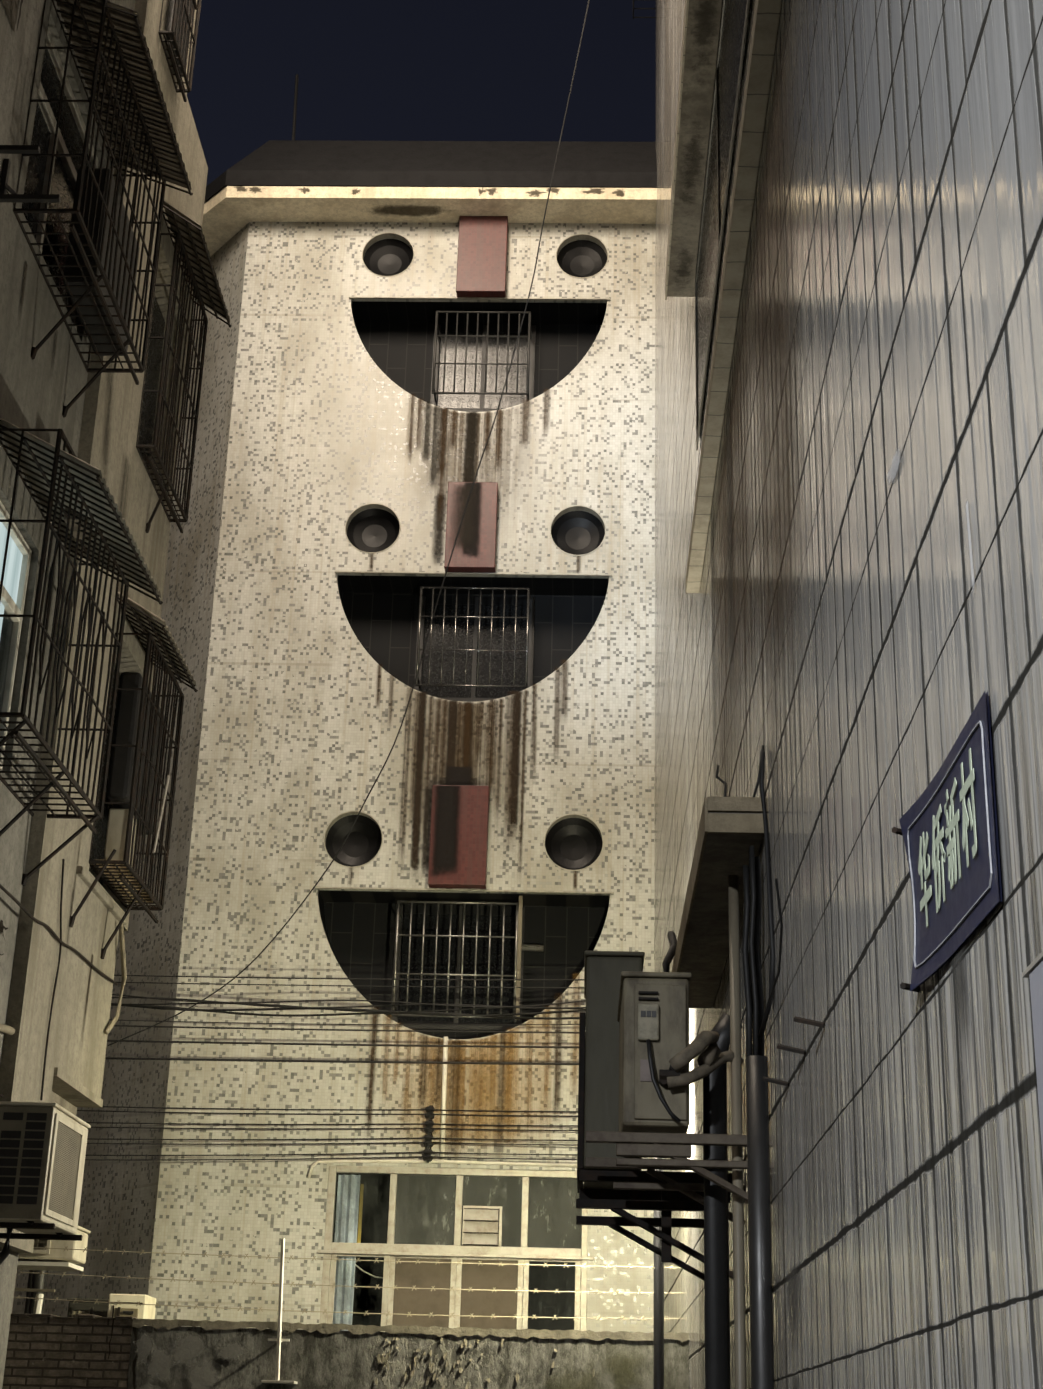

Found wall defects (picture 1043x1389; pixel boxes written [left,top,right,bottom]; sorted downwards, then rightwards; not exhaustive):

rust [409,389,549,509]
rust [555,660,567,744]
rust [377,664,536,868]
rust [367,1007,519,1138]
rust [545,994,576,1107]
peeling [375,1337,483,1389]